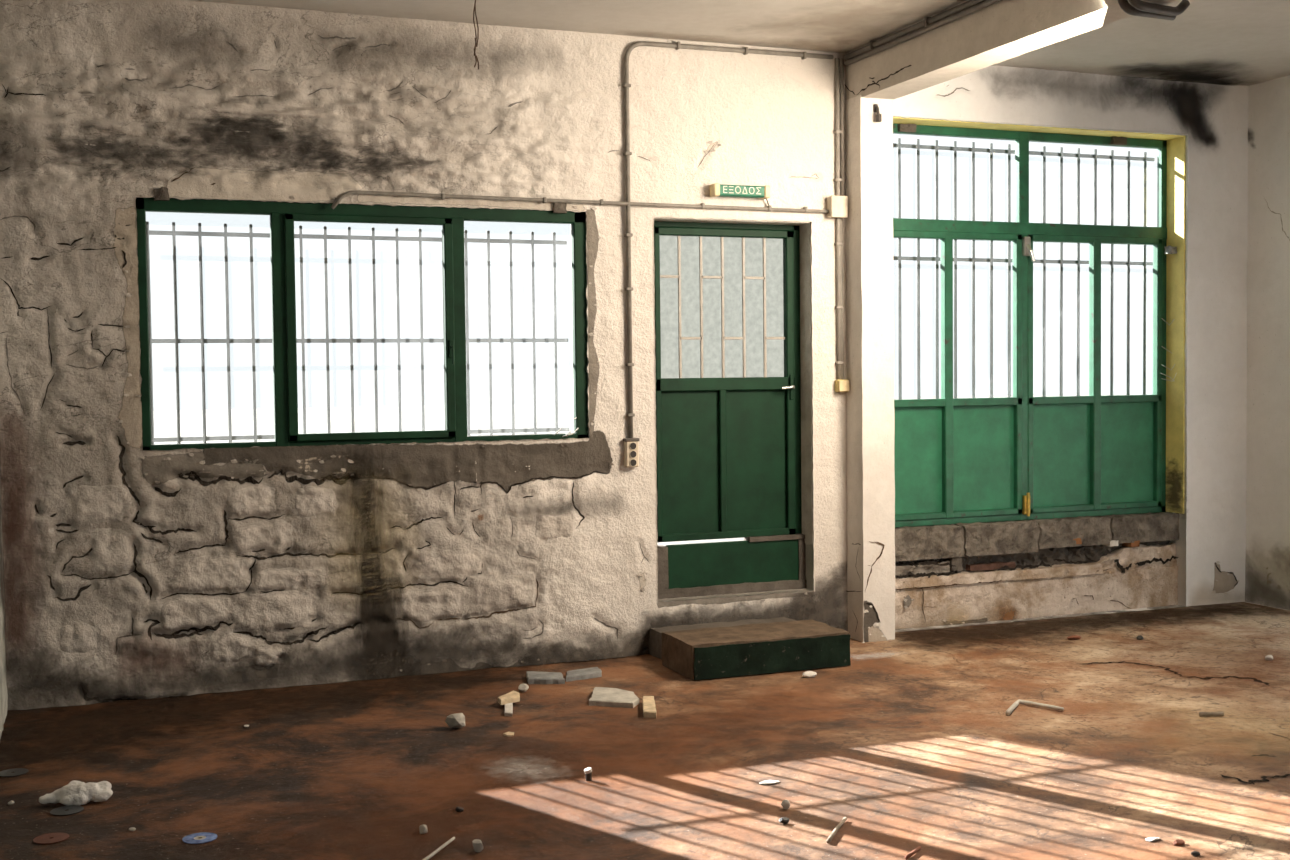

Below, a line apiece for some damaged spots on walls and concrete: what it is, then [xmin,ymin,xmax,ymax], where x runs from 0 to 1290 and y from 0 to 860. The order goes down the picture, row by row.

flaking render [109,206,614,497]
crack [0,215,544,665]
spalling [895,554,969,579]
flaking render [997,543,1178,573]
flaking render [1212,561,1239,594]
leakage [0,448,848,770]
crack [1086,661,1270,686]